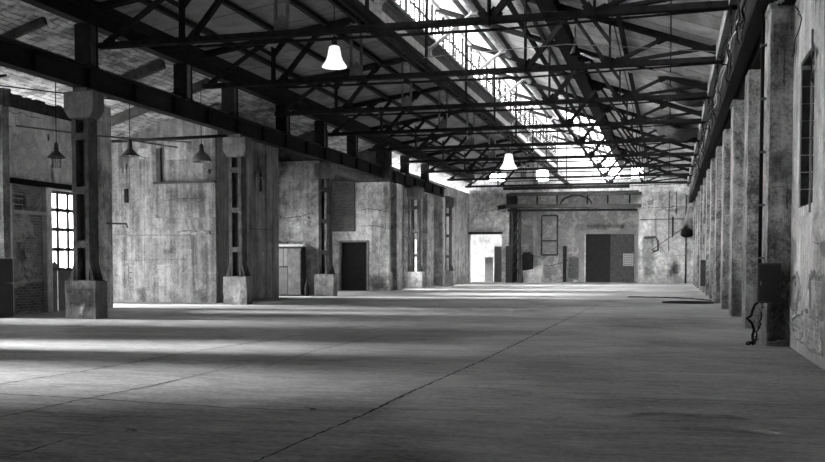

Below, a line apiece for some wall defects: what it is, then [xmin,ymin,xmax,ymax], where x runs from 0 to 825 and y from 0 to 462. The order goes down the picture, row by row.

spalling [767,269,825,357]